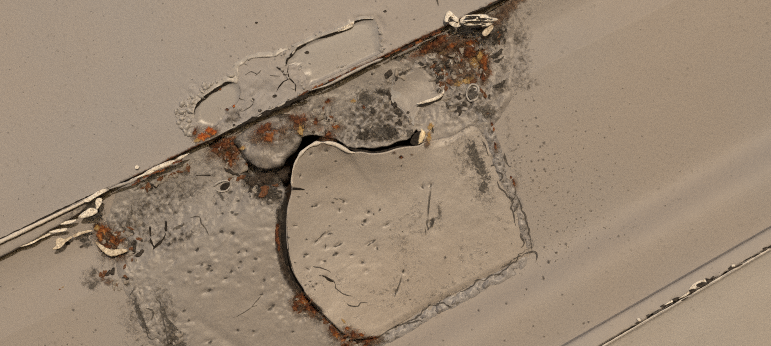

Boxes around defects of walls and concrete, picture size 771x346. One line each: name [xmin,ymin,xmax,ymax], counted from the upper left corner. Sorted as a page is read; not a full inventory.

peeling [190,16,383,181]
rust [385,30,488,86]
peeling [380,11,501,129]
rust [192,113,318,166]
peeling [20,153,193,250]
rust [95,224,122,249]
peeling [95,214,144,291]
peeling [294,275,373,346]
rust [329,319,377,346]